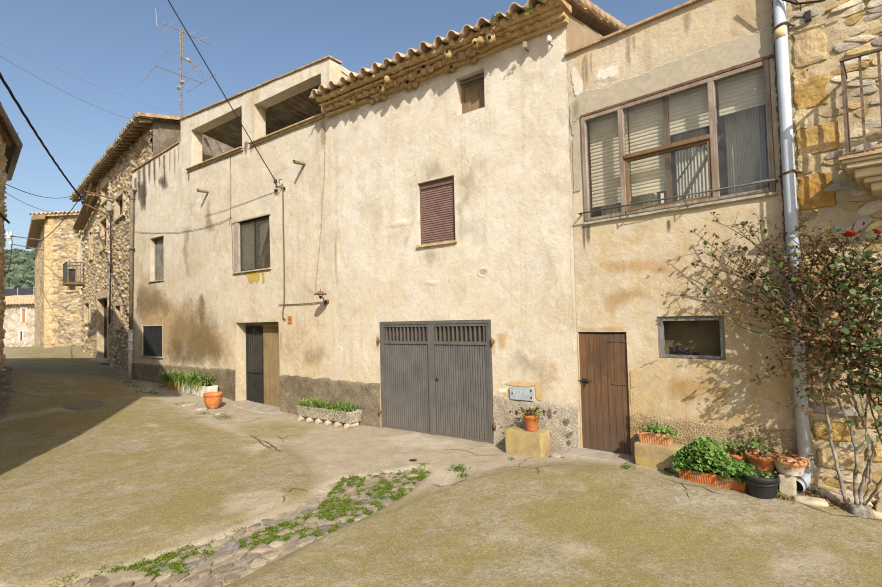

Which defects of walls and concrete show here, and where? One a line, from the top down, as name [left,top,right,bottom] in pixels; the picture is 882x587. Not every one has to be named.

peeling [566,66,584,95]
peeling [596,65,619,80]
damp [135,150,179,207]